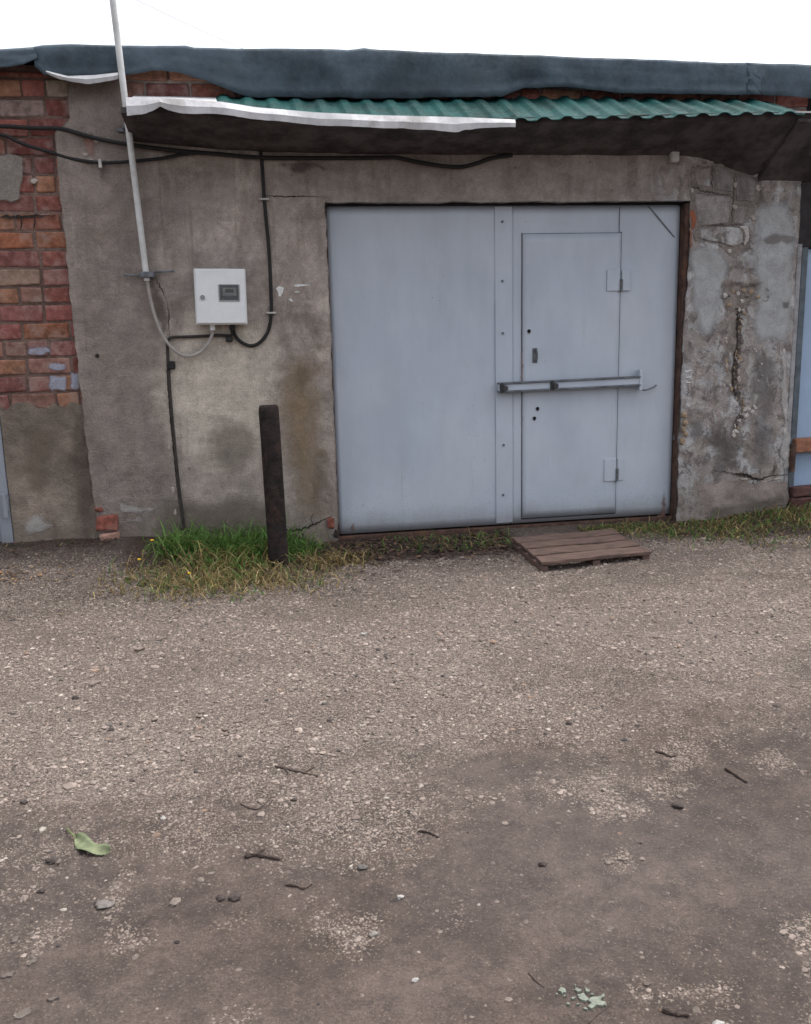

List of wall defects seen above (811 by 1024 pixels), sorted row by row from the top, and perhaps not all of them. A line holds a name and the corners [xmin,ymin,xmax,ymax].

spalling [690,165,761,257]
peeling [28,347,79,390]
crack [714,466,788,484]
spalling [95,507,121,541]